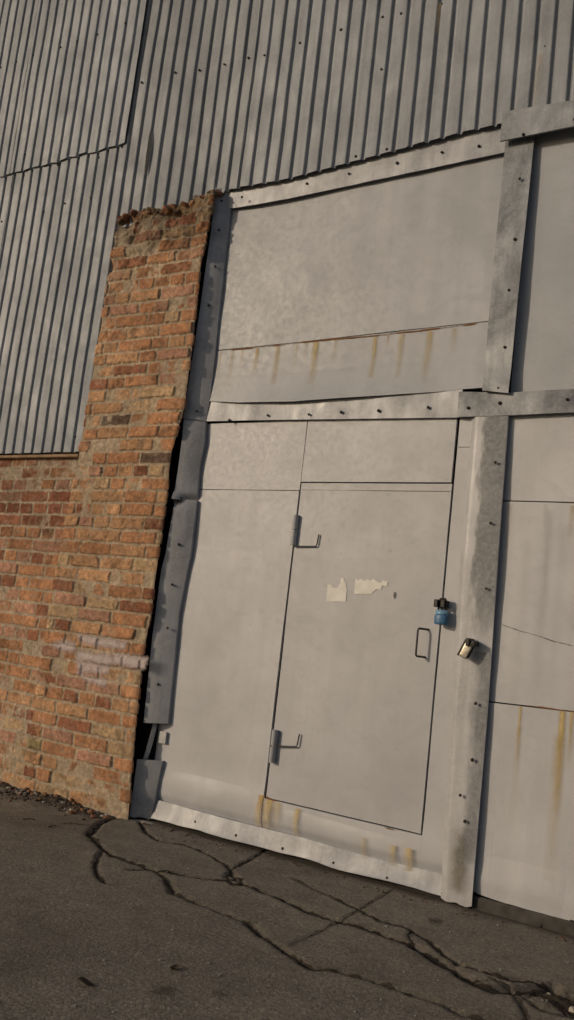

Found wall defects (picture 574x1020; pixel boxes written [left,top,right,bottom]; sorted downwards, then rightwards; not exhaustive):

rust [231,323,476,359]
rust [537,706,573,749]